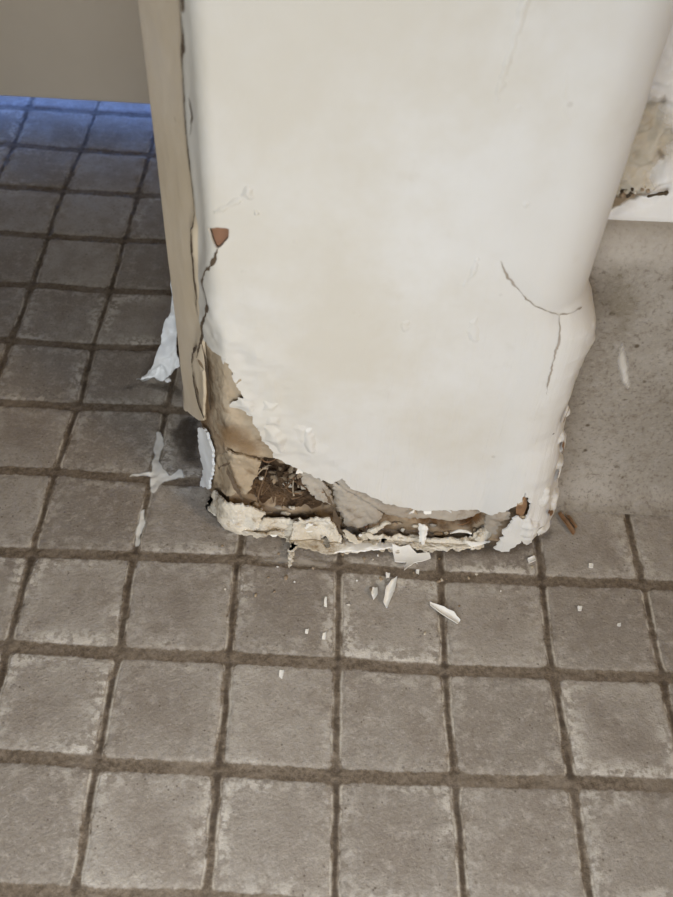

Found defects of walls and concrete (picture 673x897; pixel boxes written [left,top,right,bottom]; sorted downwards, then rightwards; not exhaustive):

crack [179,0,218,420]
peeling [212,227,229,246]
spalling [612,102,673,209]
crack [501,262,582,394]
spalling [197,342,570,568]